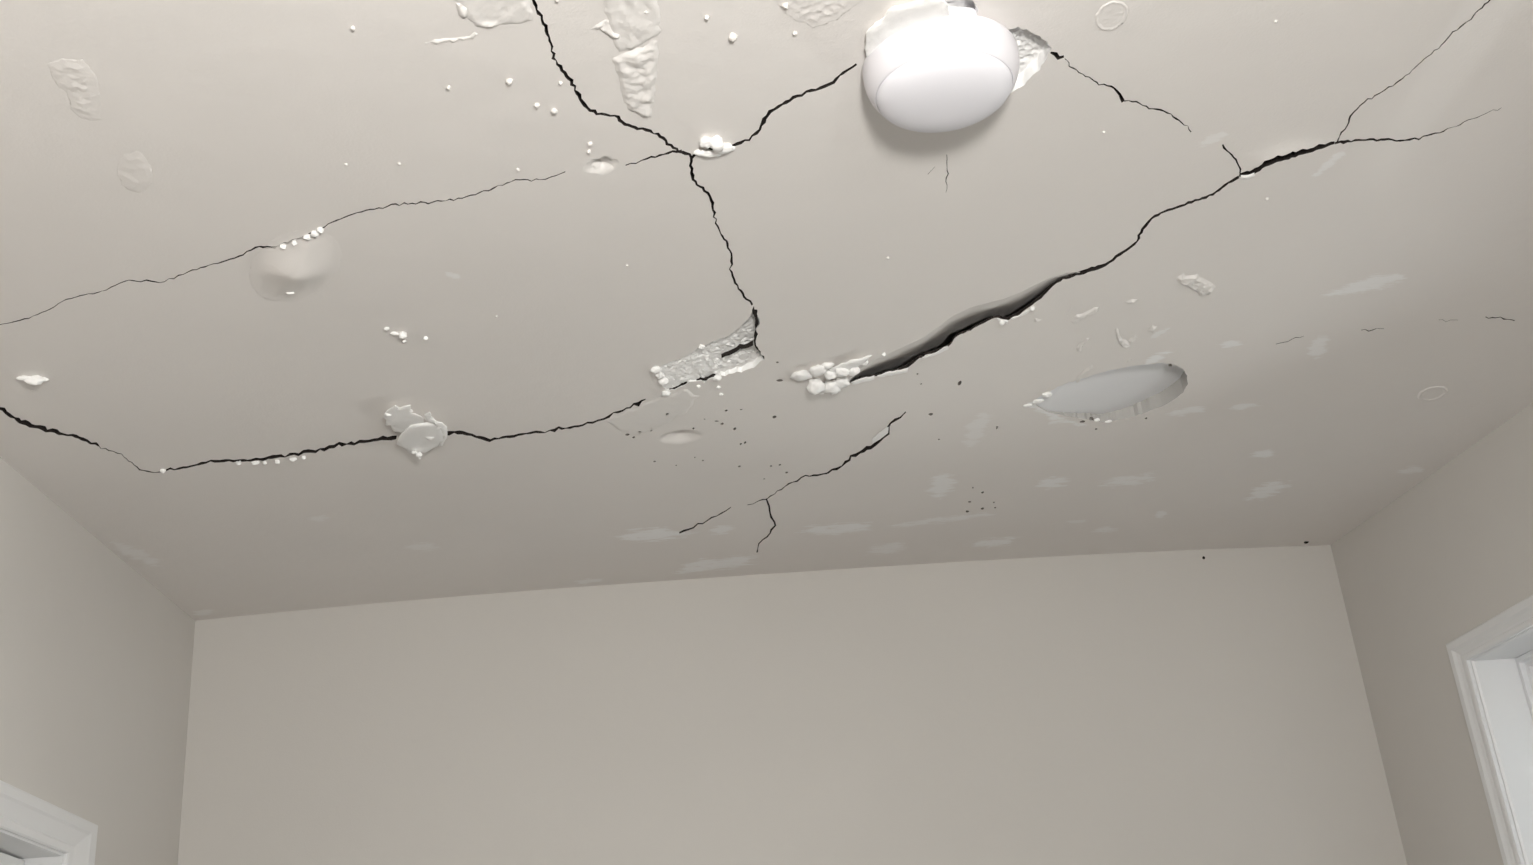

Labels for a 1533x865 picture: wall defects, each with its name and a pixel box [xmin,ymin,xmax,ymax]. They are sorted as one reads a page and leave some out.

flaking render [455,0,533,28]
crack [0,172,564,325]
crack [532,0,857,305]
crack [850,0,1498,383]
flaking render [653,307,783,391]
crack [0,407,397,473]
crack [447,399,646,442]
crack [679,412,906,552]